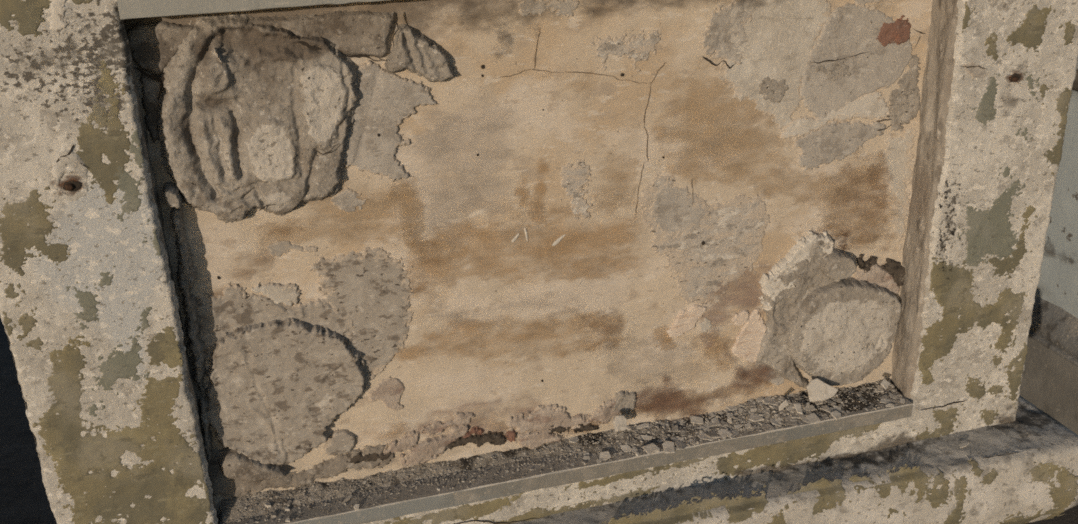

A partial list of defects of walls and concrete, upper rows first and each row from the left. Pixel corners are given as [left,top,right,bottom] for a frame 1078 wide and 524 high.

spalling [384,24,455,83]
flaking render [876,15,911,47]
crack [495,29,666,215]
peeling [0,61,213,524]
peeling [250,282,302,307]
spalling [853,244,905,295]
peeling [368,376,405,411]
spalling [323,389,650,468]
peeling [377,378,998,524]